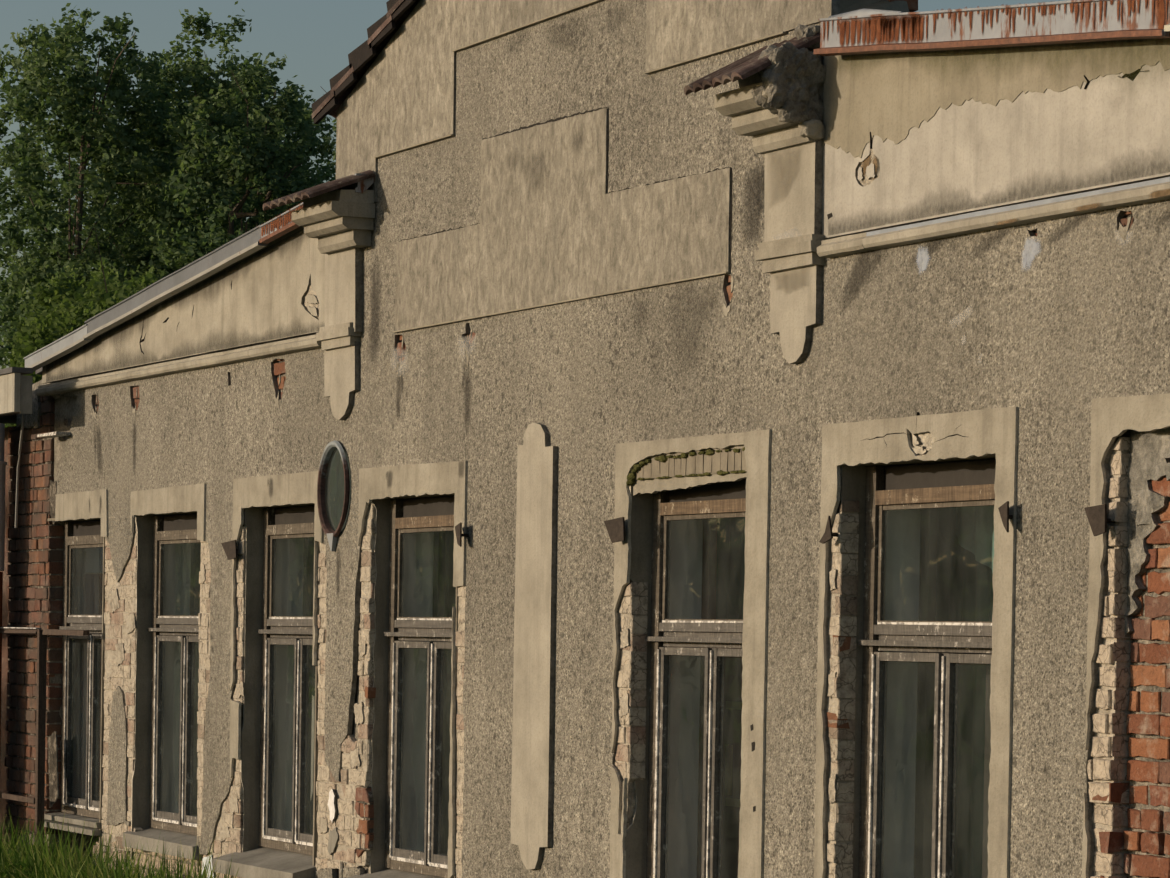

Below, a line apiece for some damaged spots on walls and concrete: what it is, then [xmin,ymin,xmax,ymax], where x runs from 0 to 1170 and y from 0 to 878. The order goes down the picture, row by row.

corrosion [823,0,1167,47]
peeling [822,61,1170,238]
crack [861,412,966,446]
flaking render [93,524,243,878]
flaking render [233,526,246,703]
flaking render [315,504,376,878]
flaking render [455,586,466,878]
flaking render [615,582,648,830]
flaking render [826,500,859,878]
flaking render [1086,437,1133,878]